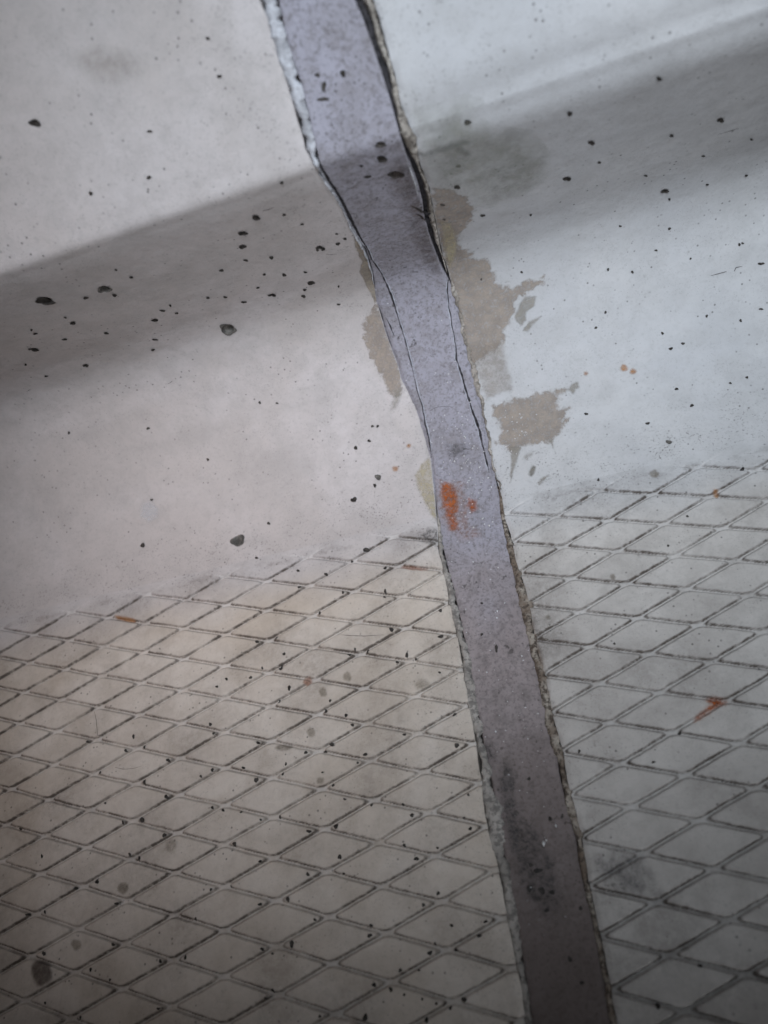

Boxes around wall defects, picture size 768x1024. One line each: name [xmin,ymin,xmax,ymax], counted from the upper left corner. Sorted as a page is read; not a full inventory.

crack [315,0,489,472]
leakage [431,188,543,363]
leakage [363,305,401,396]
leakage [493,383,578,474]
rust [442,484,475,529]